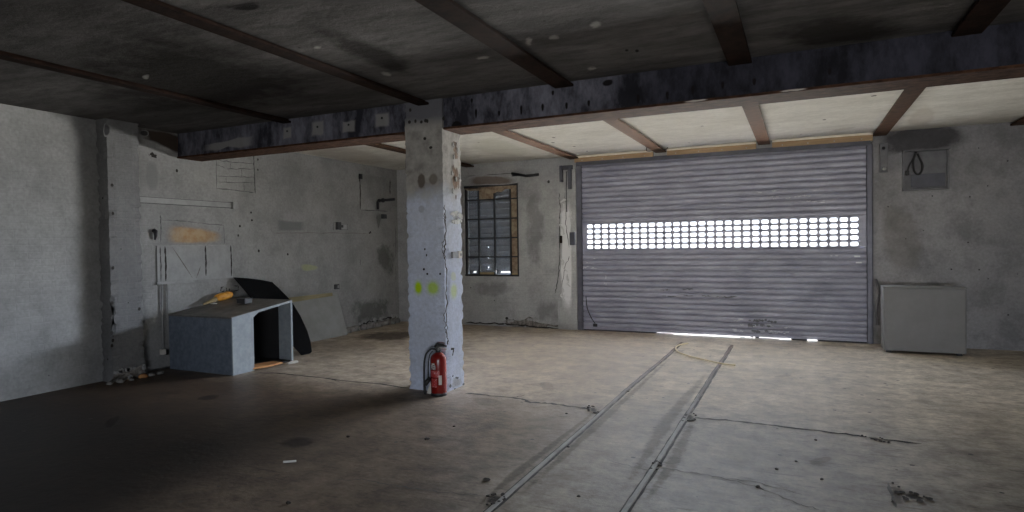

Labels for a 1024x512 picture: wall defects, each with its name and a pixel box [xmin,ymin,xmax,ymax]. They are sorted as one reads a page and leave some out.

spalling [451,141,461,194]
spalling [450,211,463,224]
crack [442,205,454,356]
crack [466,393,589,409]
crack [696,417,922,444]